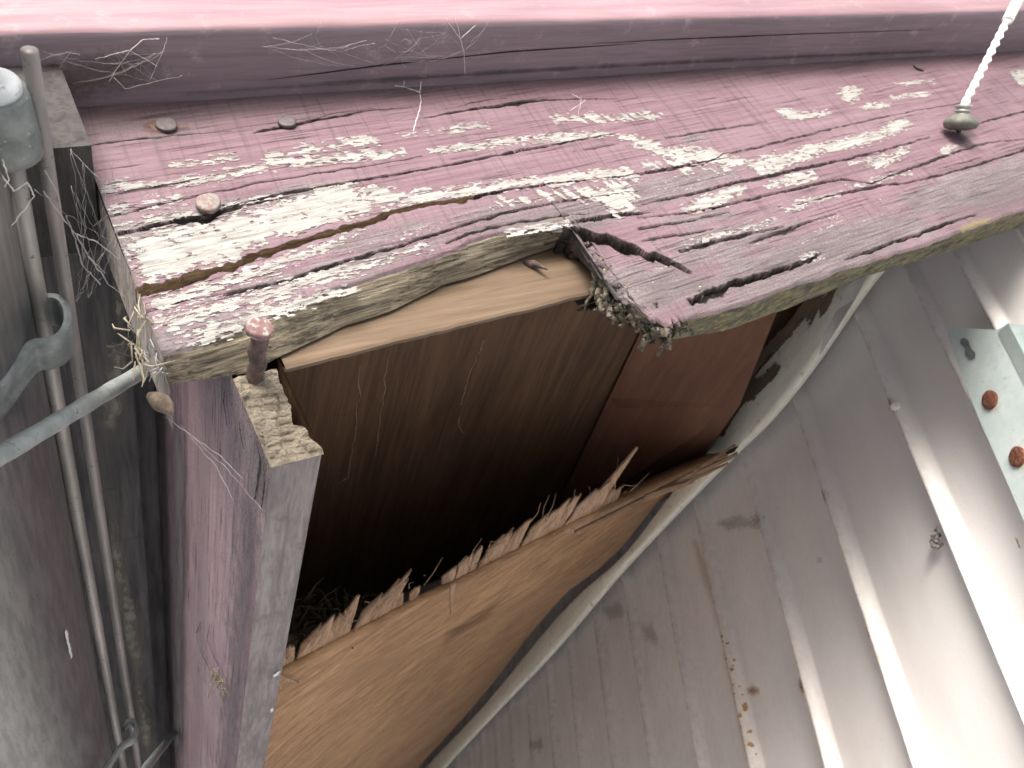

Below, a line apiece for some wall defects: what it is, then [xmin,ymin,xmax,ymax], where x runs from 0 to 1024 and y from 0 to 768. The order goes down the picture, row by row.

crack [459,98,531,108]
spalling [101,78,936,384]
crack [219,100,1024,297]
crack [692,256,818,306]
peeling [940,144,961,155]
peeling [719,288,837,437]
rust [721,635,758,755]